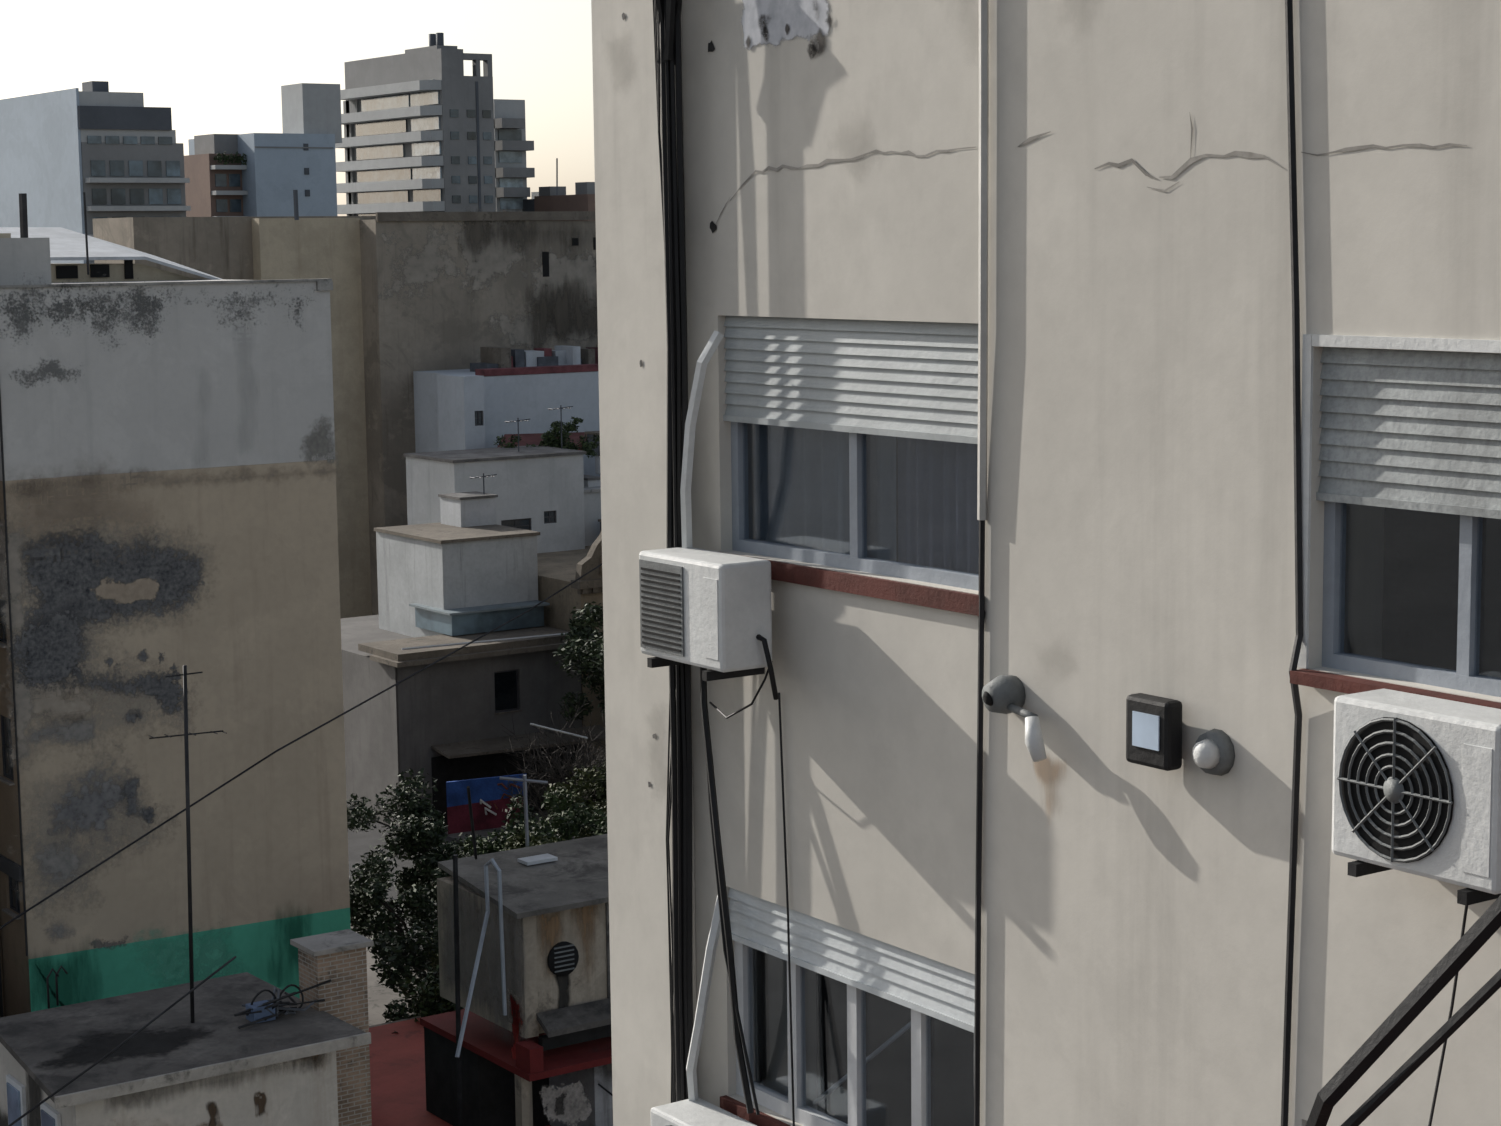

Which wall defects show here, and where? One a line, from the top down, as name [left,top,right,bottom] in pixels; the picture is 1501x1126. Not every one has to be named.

peeling [741,0,831,58]
crack [1017,131,1051,147]
crack [1095,116,1467,192]
crack [715,147,975,226]
water stain [0,282,171,345]